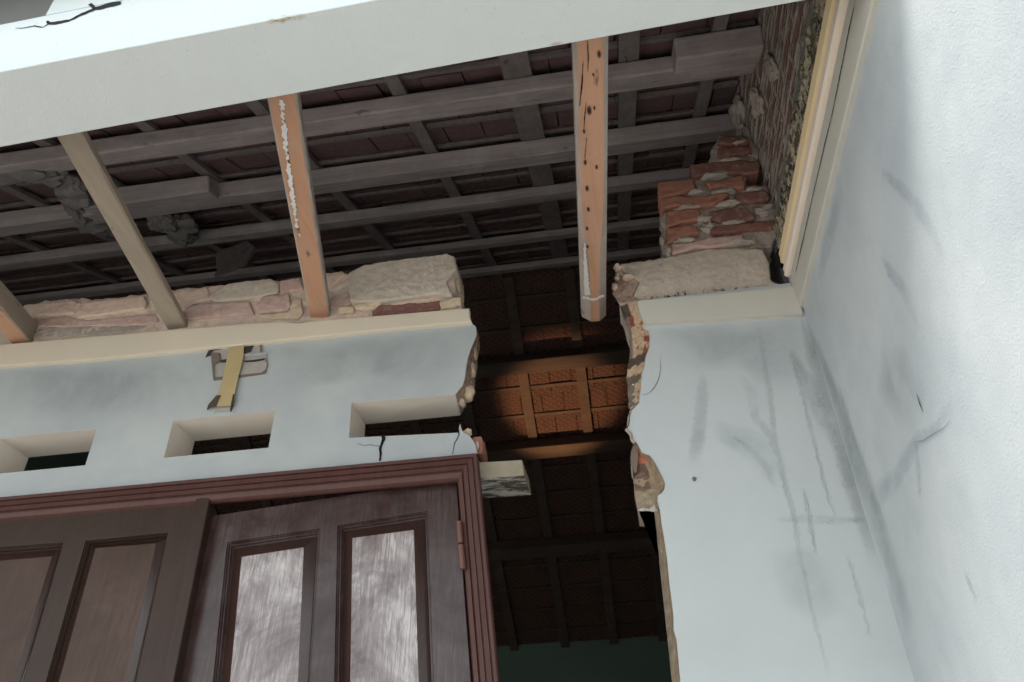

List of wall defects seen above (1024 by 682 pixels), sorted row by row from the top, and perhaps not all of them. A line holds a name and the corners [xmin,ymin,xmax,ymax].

crack [24,1,121,28]
spalling [206,345,268,413]
spalling [456,331,480,414]
spalling [612,263,665,512]
crack [360,435,385,461]